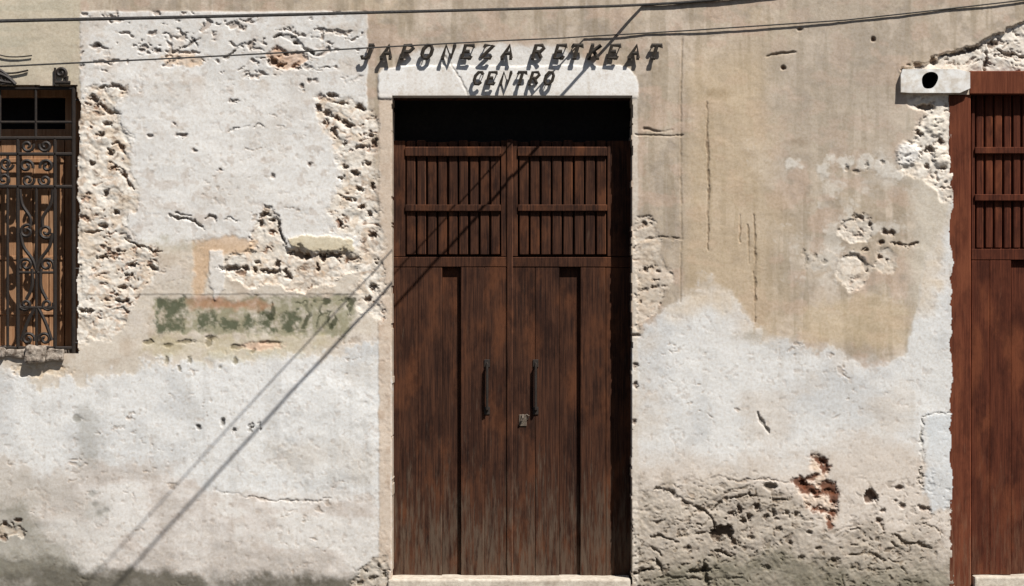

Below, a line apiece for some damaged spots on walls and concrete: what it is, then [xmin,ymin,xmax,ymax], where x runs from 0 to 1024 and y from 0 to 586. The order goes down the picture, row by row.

spalling [152,49,205,69]
spalling [266,46,318,89]
spalling [901,22,1024,72]
spalling [76,83,163,345]
spalling [143,93,388,371]
spalling [632,216,674,331]
spalling [802,213,919,293]
crack [234,493,300,503]
flaking render [725,454,840,546]
peeling [880,411,953,515]